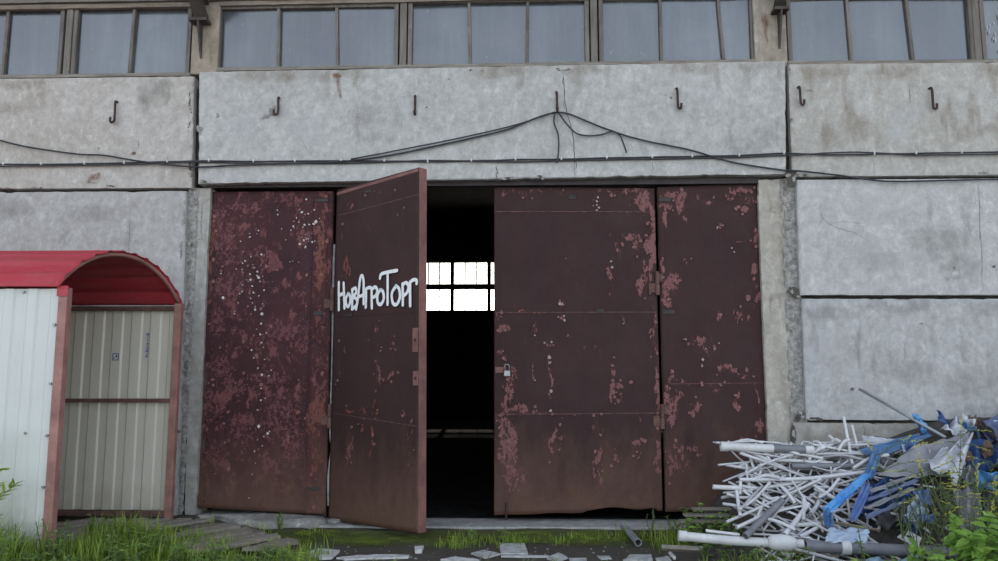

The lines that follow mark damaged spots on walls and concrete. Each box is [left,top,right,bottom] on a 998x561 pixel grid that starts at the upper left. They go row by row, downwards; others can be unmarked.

peeling [202,192,340,487]
peeling [495,309,576,495]
peeling [587,186,761,487]